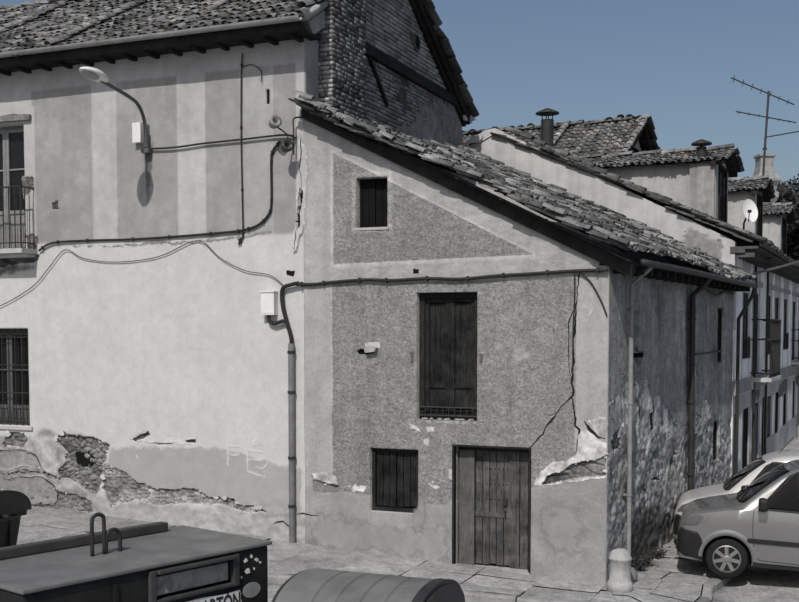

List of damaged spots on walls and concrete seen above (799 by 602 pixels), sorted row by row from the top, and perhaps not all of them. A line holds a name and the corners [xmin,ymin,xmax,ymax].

crack [529,274,580,448]
flaking render [534,347,677,486]
flaking render [694,398,711,435]
flaking render [0,430,267,513]
flaking render [312,472,366,493]